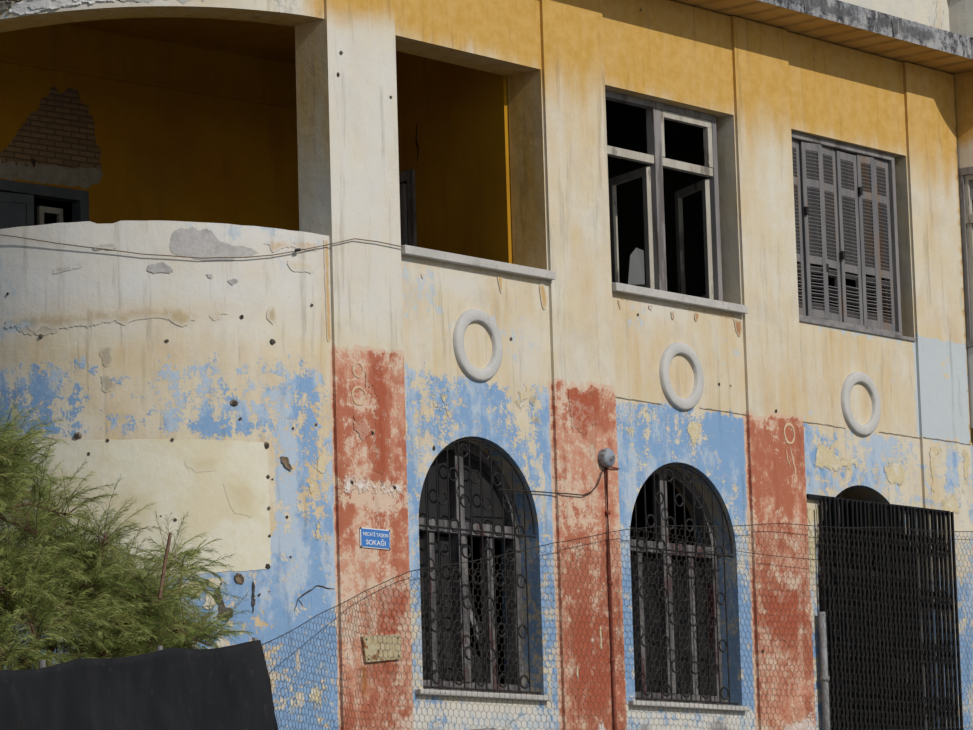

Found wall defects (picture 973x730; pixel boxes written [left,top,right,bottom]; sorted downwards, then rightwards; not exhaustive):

spalling [0,0,115,16]
damp [781,0,858,20]
damp [871,0,944,43]
flaking render [0,87,103,189]
peeling [170,226,258,262]
peeling [687,421,702,447]
peeling [784,423,796,482]
peeling [181,573,270,621]